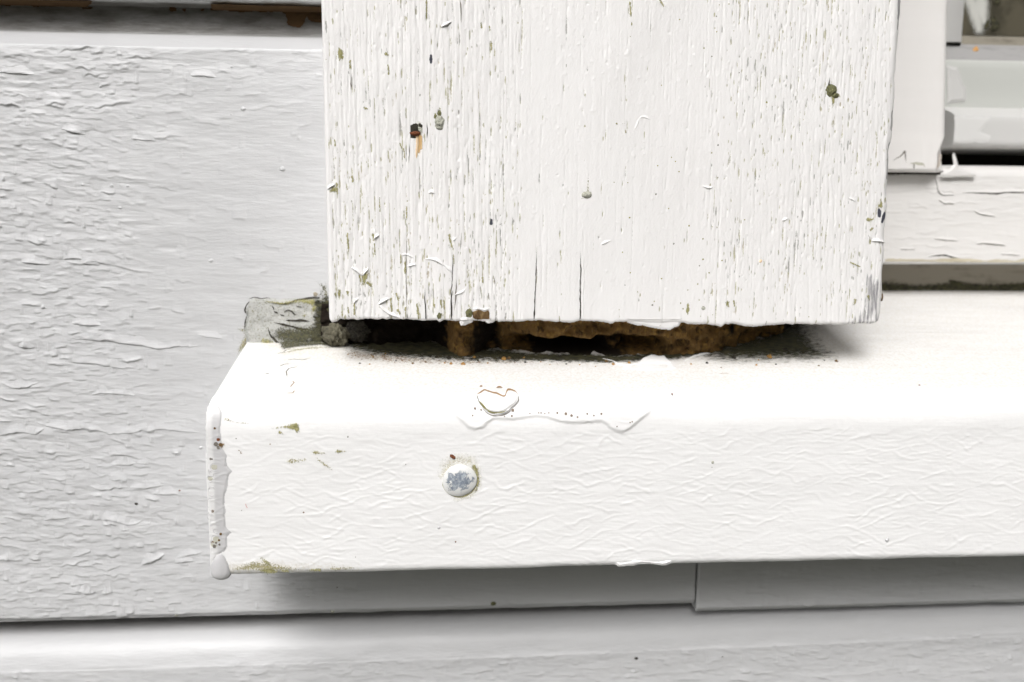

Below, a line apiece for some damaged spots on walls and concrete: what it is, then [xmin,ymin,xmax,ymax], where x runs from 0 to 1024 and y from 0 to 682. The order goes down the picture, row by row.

spalling [459,305,494,326]
damp [262,283,834,363]
peeling [626,318,682,330]